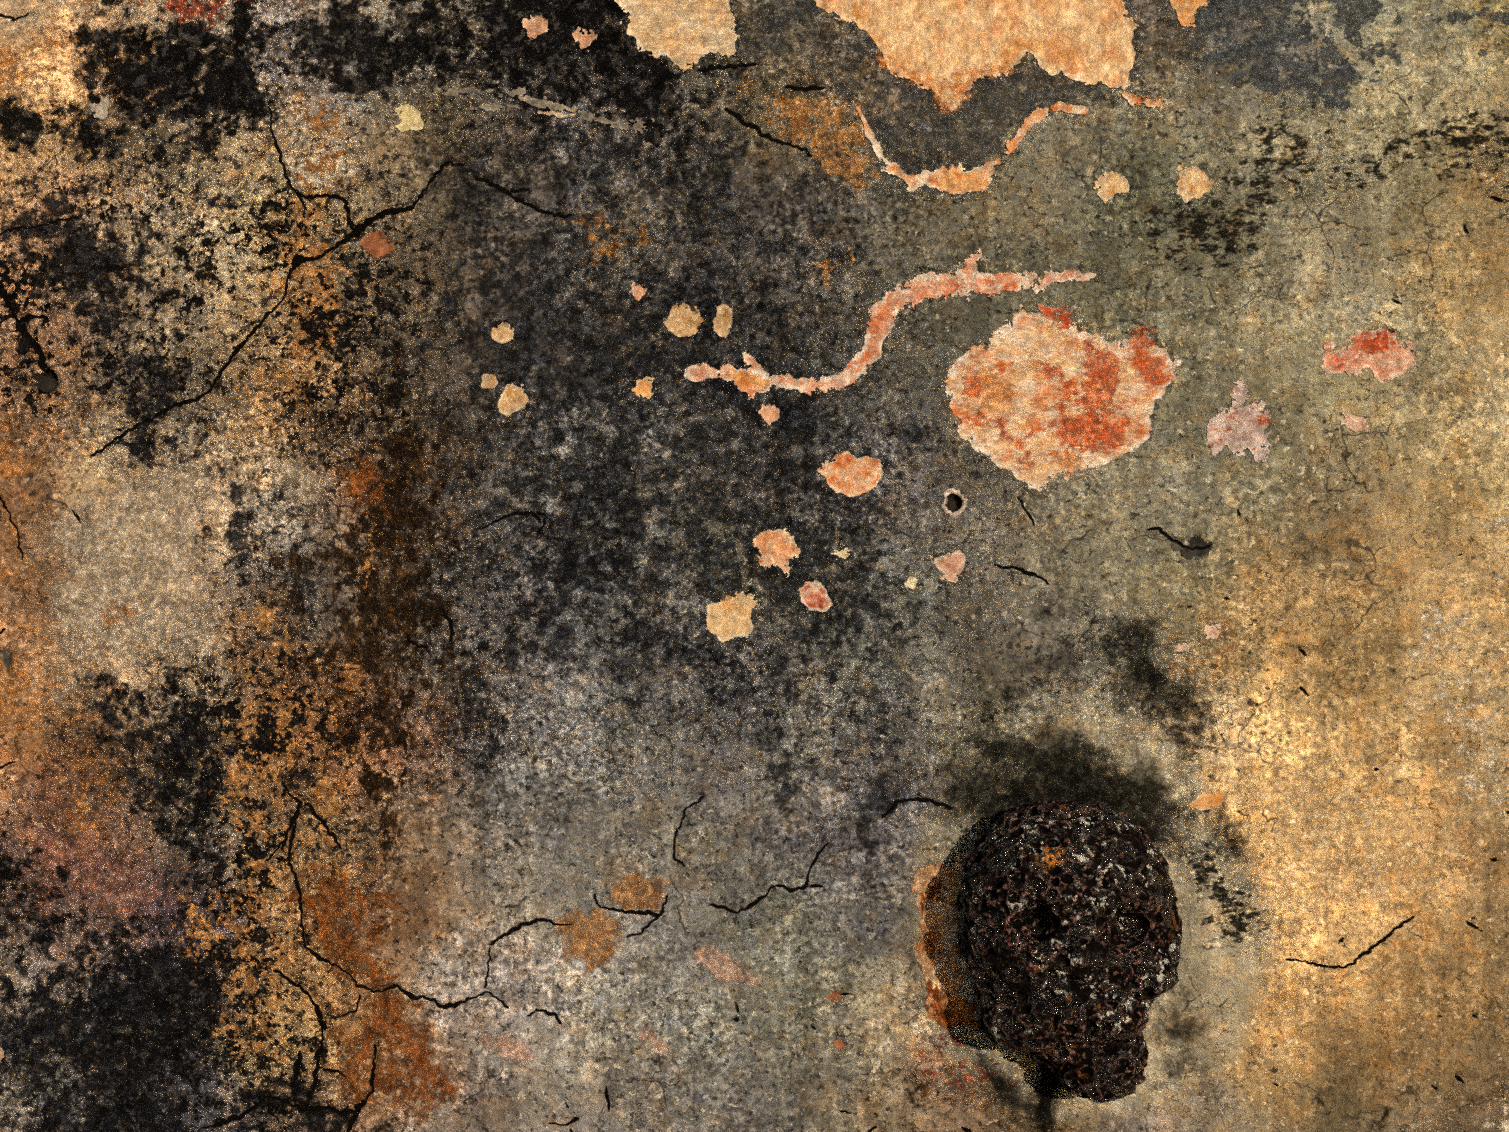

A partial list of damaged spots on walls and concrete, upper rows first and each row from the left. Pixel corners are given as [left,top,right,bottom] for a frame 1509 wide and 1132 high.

peeling [614,0,740,72]
peeling [815,0,1163,113]
peeling [856,101,1089,195]
water stain [1113,100,1509,275]
crack [0,286,57,383]
crack [90,100,572,457]
peeling [684,248,1182,497]
water stain [0,0,946,1132]
corrosion [276,863,465,1125]
crack [200,782,703,1132]
crack [708,842,829,914]
water stain [883,1080,966,1108]